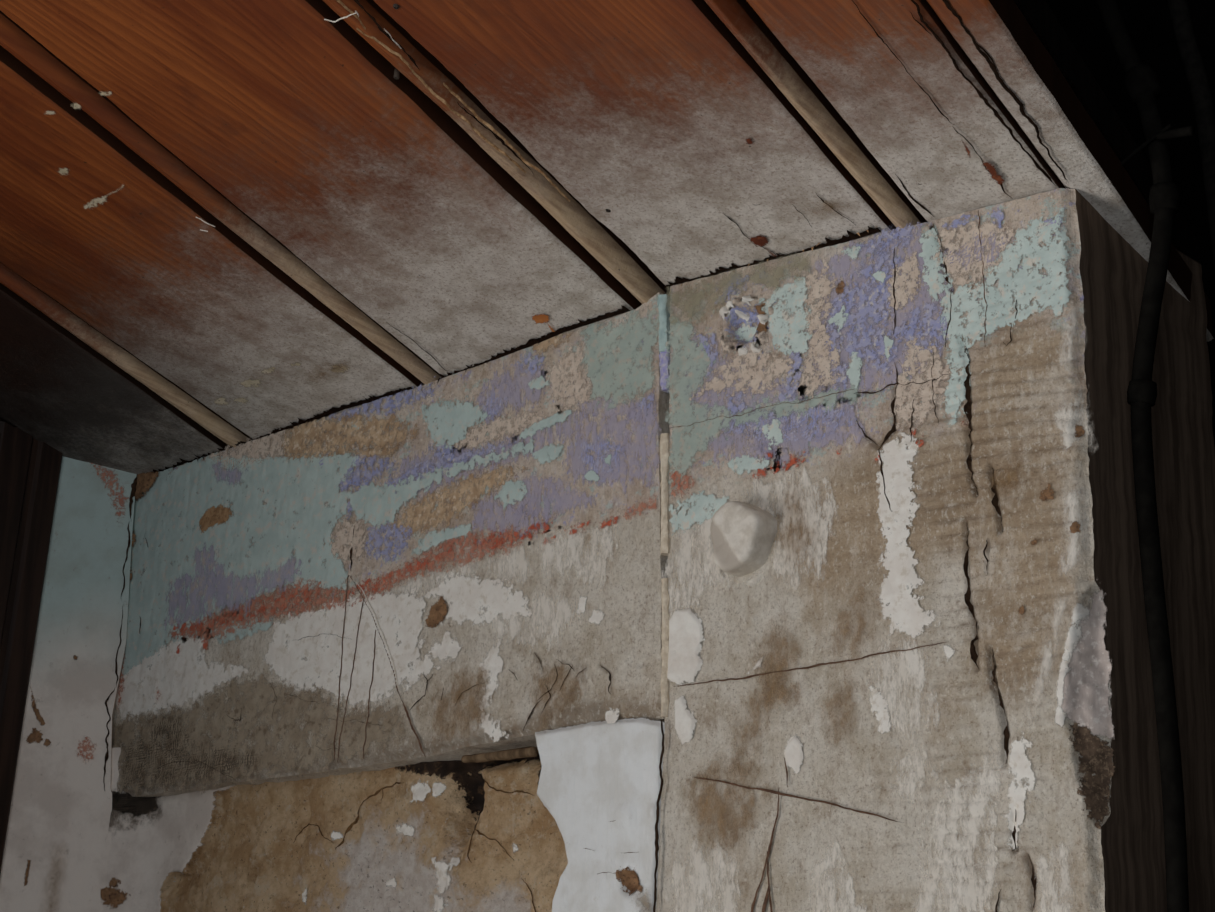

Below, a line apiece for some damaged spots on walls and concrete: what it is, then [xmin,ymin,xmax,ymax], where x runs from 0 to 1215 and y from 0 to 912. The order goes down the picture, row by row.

crack [852,0,1012,198]
crack [910,0,1067,185]
crack [103,194,896,790]
peeling [91,208,1082,912]
crack [584,174,1018,912]
peeling [1055,399,1088,448]
damp [113,671,406,796]
crack [294,782,401,850]
crack [467,779,536,912]
crack [1012,809,1036,911]
spalling [1033,587,1117,829]